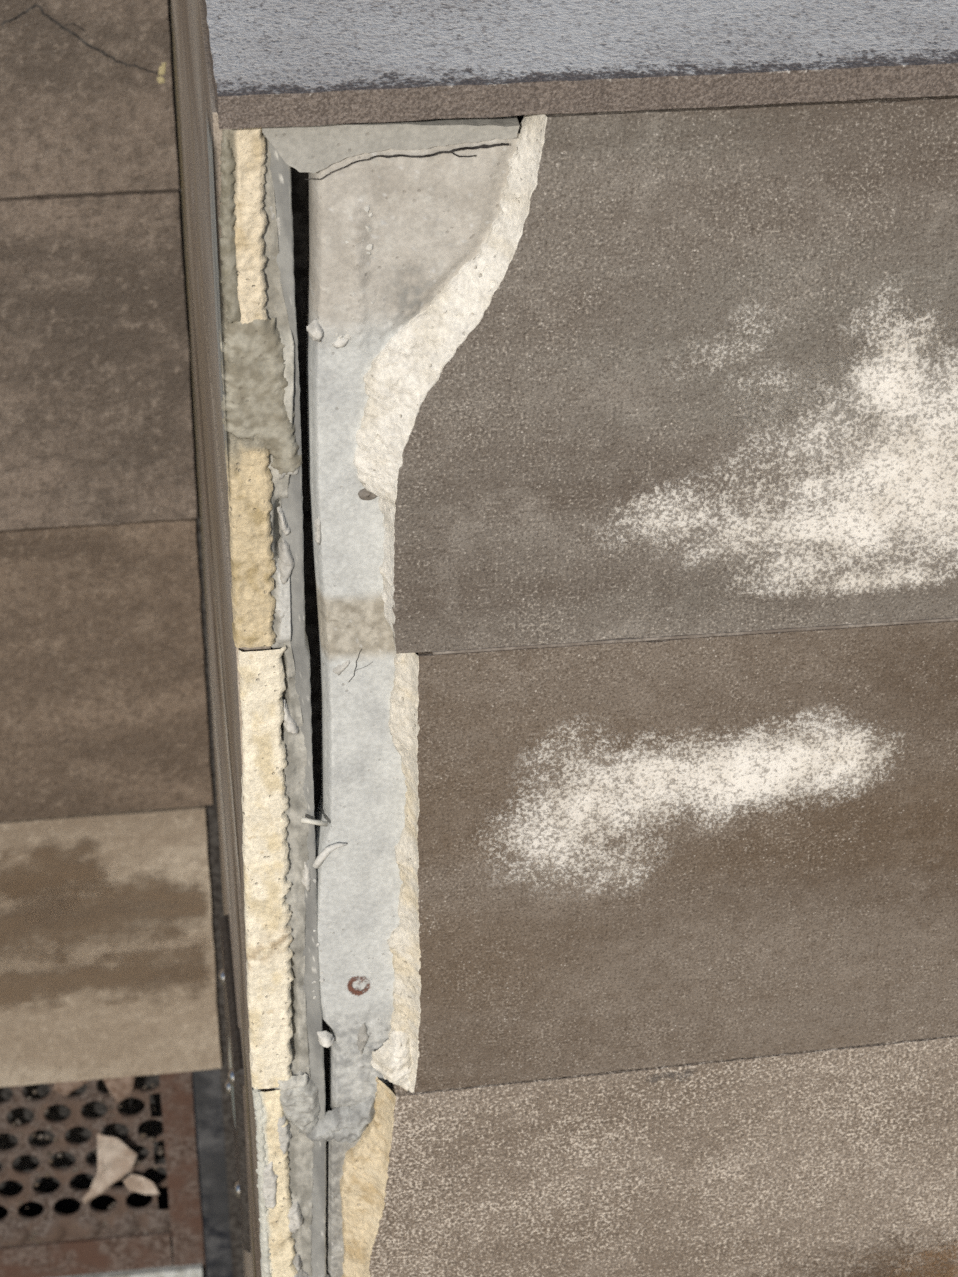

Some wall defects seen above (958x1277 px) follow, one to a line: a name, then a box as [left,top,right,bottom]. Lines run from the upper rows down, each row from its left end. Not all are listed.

crack [1,4,180,74]
damp [616,287,958,596]
spalling [218,114,547,1277]
damp [480,710,903,891]